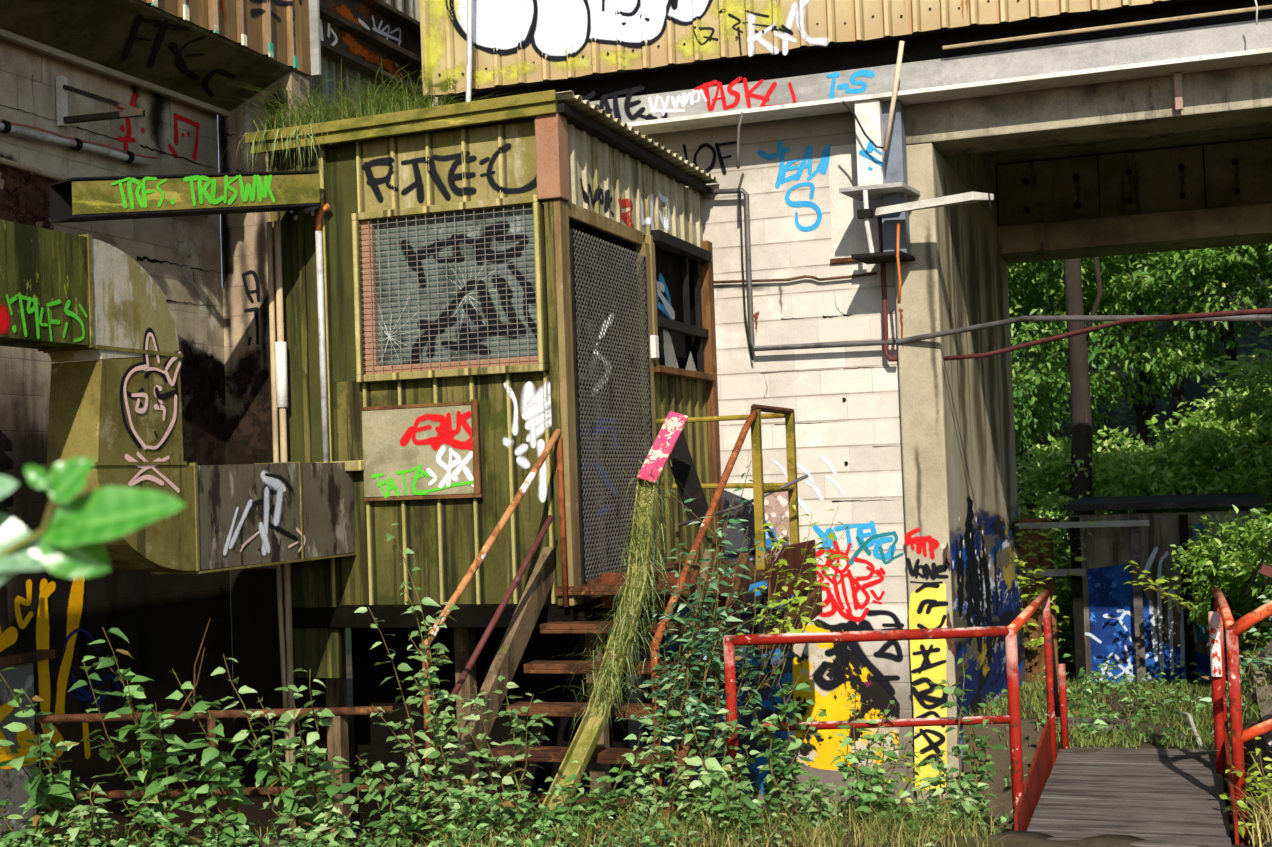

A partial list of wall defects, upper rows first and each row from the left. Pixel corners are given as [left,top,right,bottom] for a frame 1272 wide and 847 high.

damp [132,85,165,153]
damp [218,92,286,173]
damp [178,214,273,465]